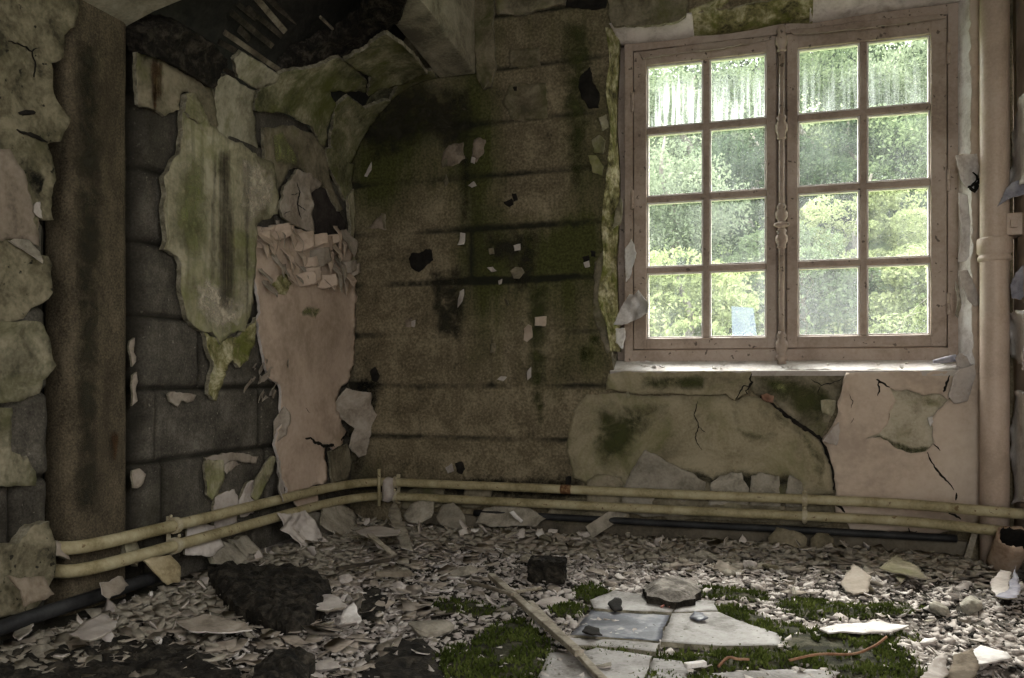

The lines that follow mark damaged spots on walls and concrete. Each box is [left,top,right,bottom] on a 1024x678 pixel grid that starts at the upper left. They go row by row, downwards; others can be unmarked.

flaking render [0,0,79,487]
damp [200,223,236,323]
flaking render [132,52,380,548]
peeling [497,0,980,534]
crack [735,374,845,513]
crack [927,444,961,520]
flaking render [0,520,57,617]